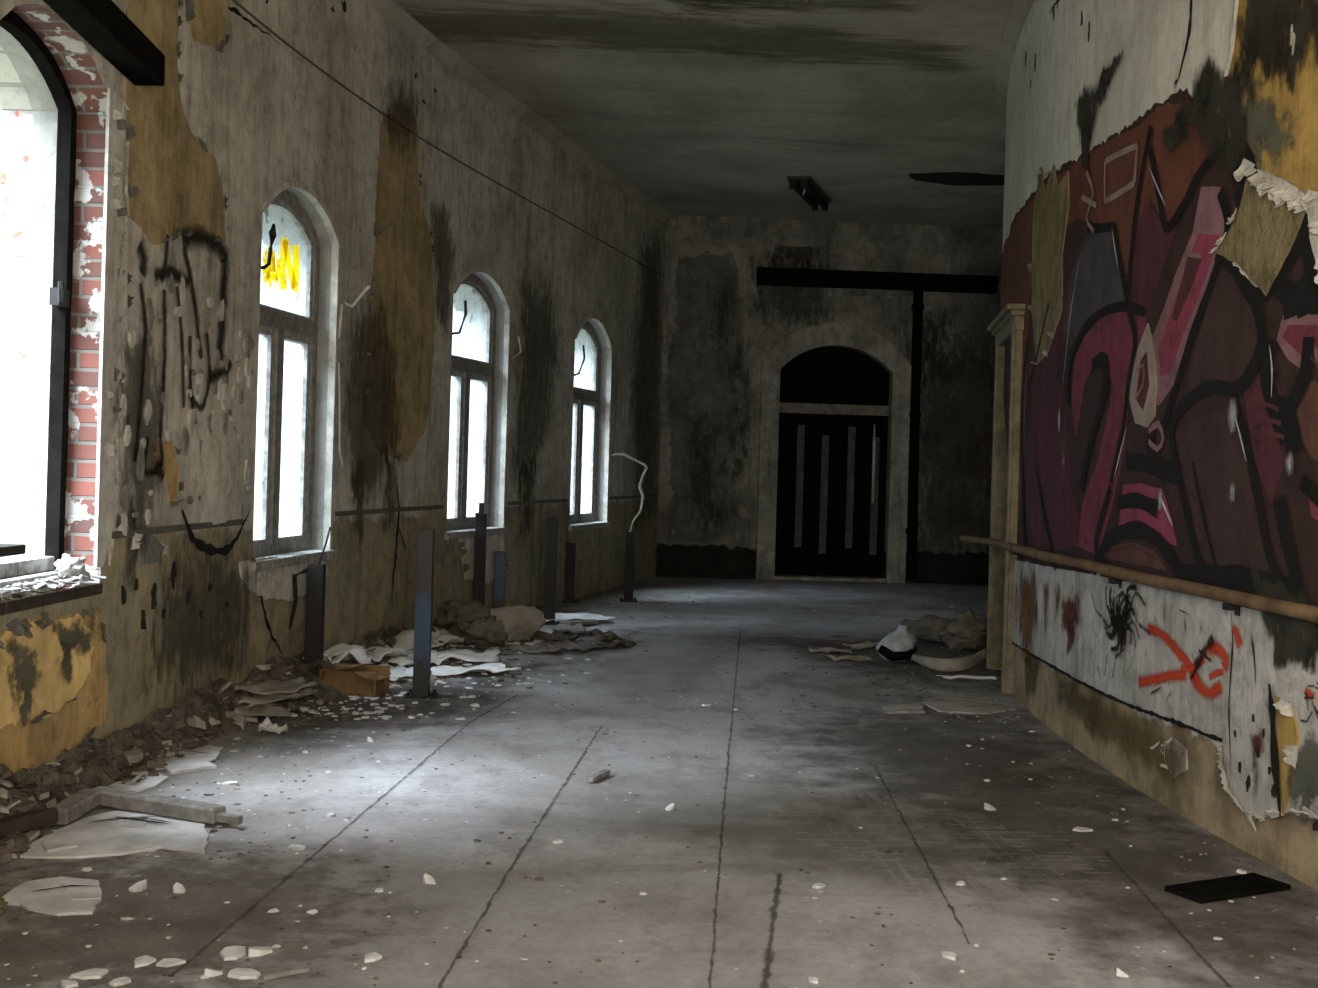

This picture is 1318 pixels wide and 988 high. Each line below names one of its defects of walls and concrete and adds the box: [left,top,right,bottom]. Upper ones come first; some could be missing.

water stain [406,0,956,70]
water stain [1162,0,1318,178]
flaking render [1210,0,1318,296]
flaking render [0,0,254,629]
peeling [1027,165,1070,365]
peeling [0,609,109,779]
peeling [1012,560,1318,831]